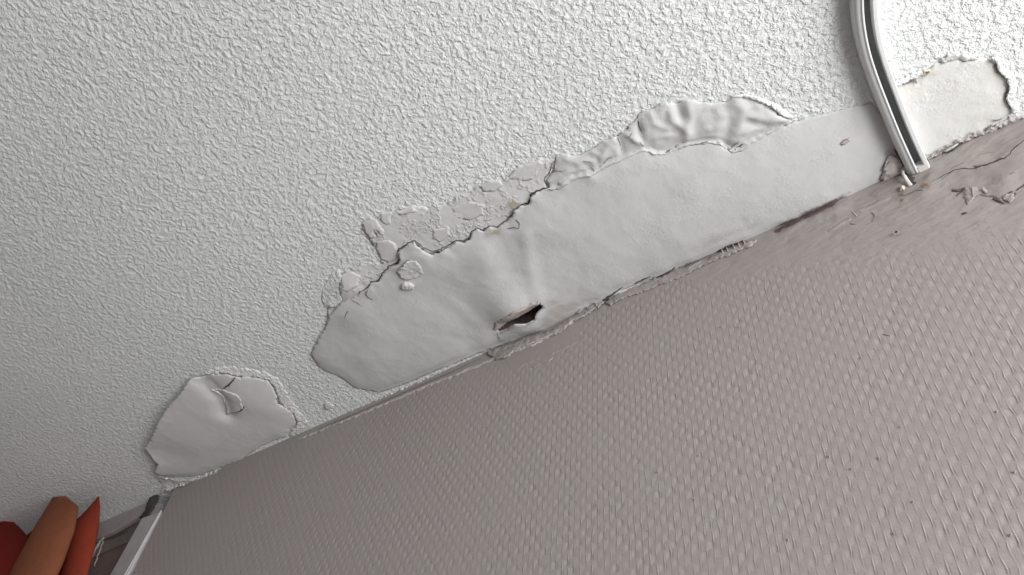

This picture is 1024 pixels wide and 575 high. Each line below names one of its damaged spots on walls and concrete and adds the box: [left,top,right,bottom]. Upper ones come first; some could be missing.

crack [344,169,551,318]
peeling [321,93,794,318]
spalling [880,148,916,185]
peeling [895,53,1020,157]
spalling [494,301,545,342]
peeling [144,366,308,494]